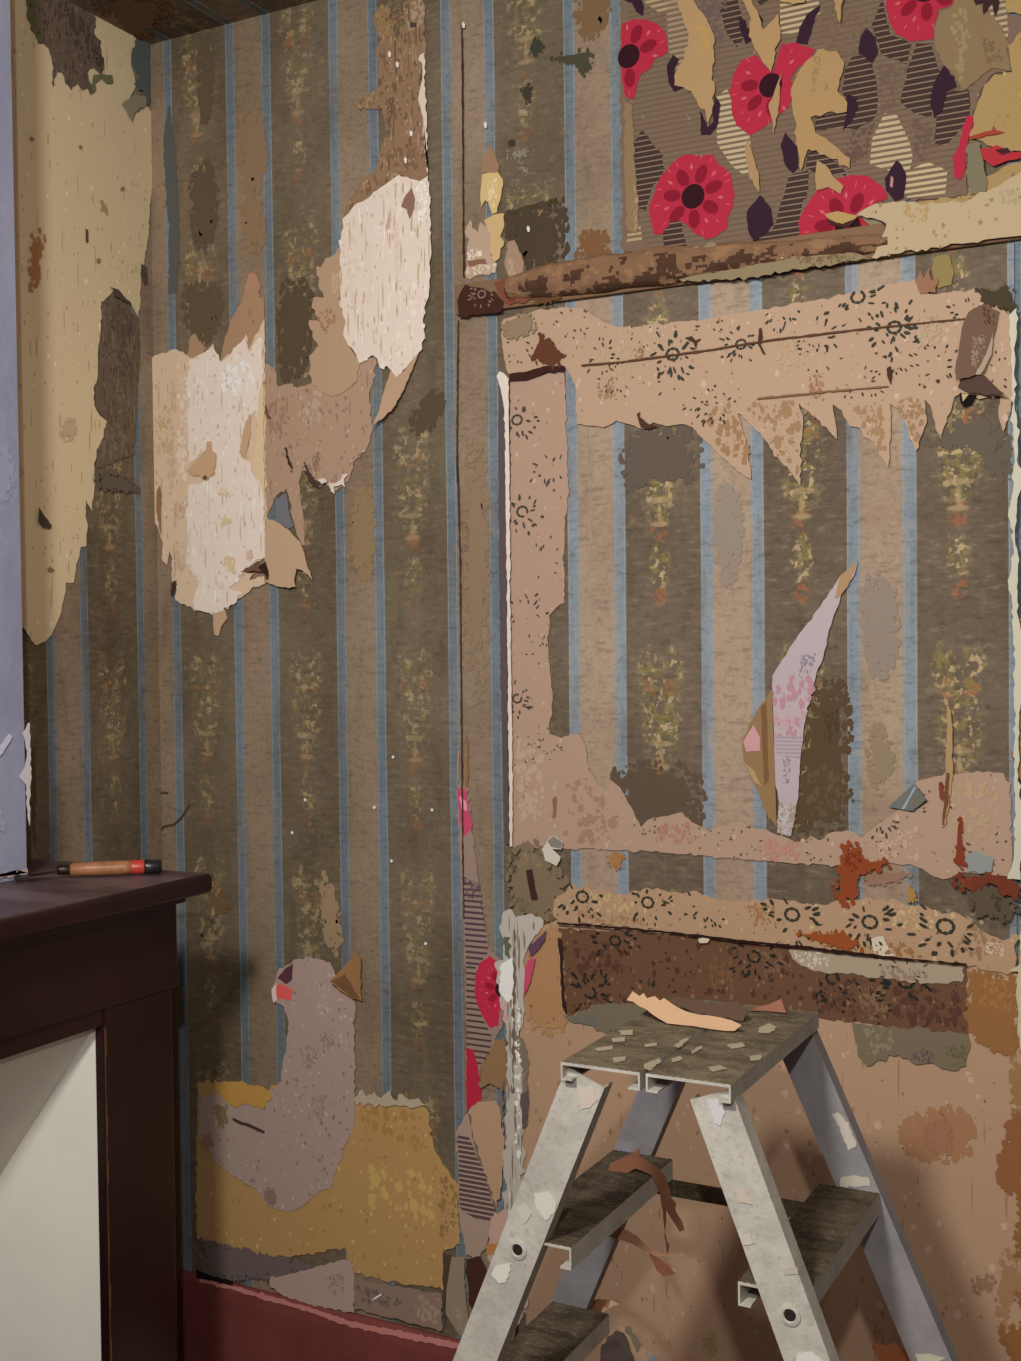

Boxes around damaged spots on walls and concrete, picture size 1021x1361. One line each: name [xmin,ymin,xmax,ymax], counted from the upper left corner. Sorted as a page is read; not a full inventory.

flaking render [338,157,431,377]
flaking render [10,0,152,645]
flaking render [186,333,265,614]
flaking render [542,835,563,866]
corrosion [830,840,913,909]
corrosion [948,816,1021,901]
leakage [897,1104,977,1165]
flaking render [195,1080,461,1300]
leakage [971,1248,1021,1331]